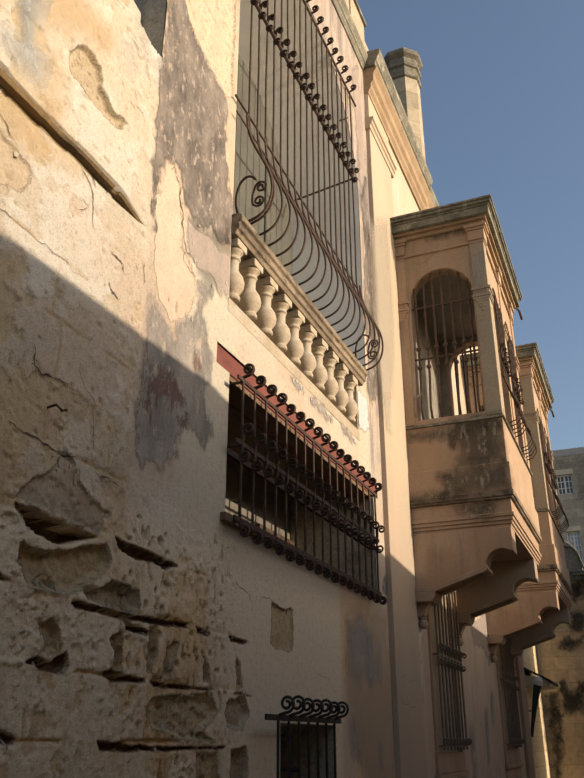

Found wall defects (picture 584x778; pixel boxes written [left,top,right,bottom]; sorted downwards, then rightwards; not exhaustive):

spalling [68,45,128,130]
crack [0,208,83,277]
crack [79,164,96,230]
peeling [135,0,236,470]
crack [31,342,97,447]
crack [8,420,119,493]
damp [409,416,510,503]
spalling [15,447,141,615]
spalling [270,602,294,652]
damp [559,582,584,651]
spalling [145,660,249,778]
damp [546,681,584,778]